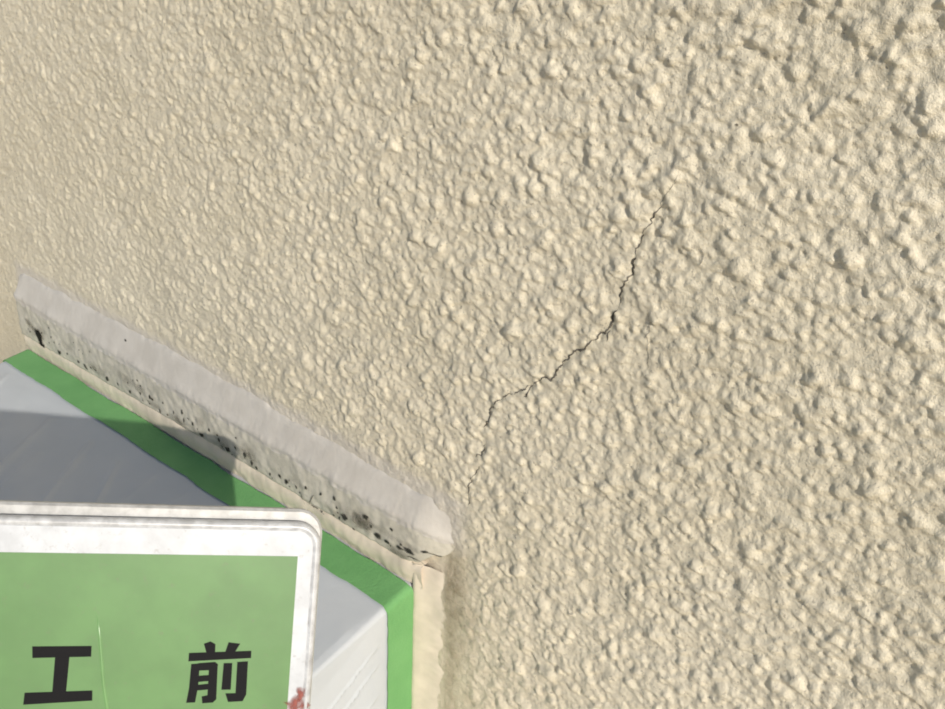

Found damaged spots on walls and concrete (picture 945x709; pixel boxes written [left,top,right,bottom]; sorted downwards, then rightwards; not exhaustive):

crack [467,177,677,505]
water stain [54,342,257,469]
water stain [363,515,428,555]